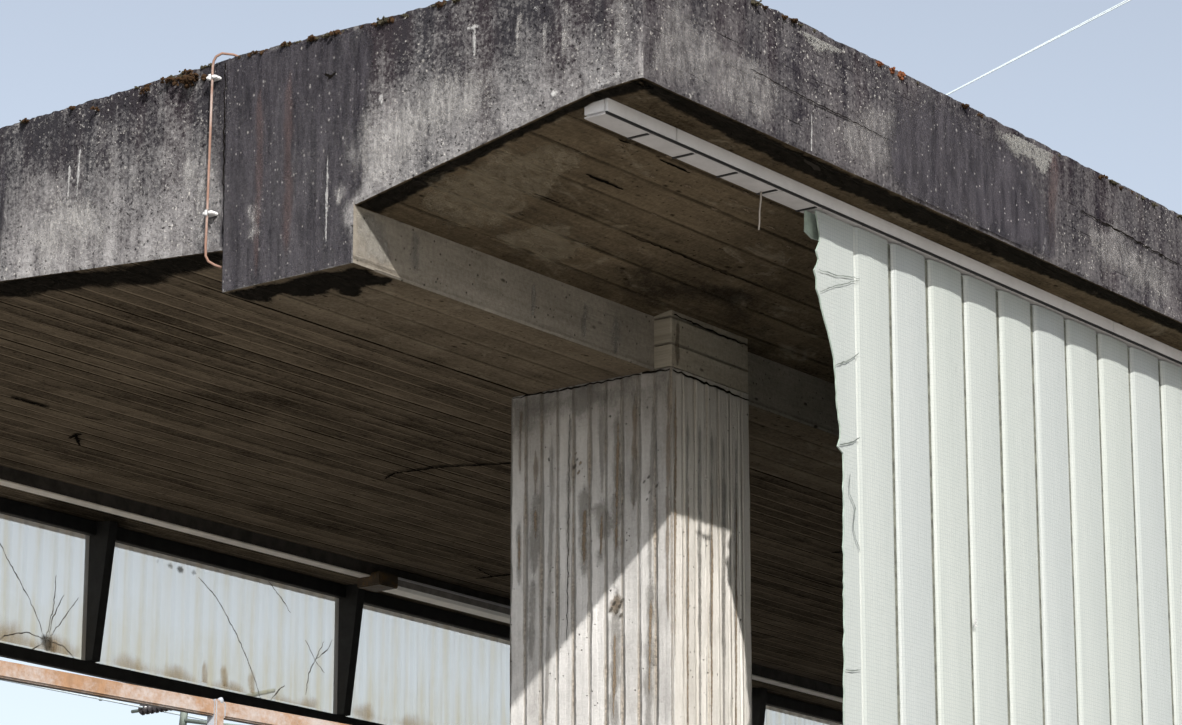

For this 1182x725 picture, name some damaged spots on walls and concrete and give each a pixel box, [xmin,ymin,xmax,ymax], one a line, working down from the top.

water stain [214,30,472,291]
water stain [890,100,1055,255]
crack [0,544,78,658]
crack [198,577,332,698]
crack [386,463,511,479]
water stain [515,402,556,715]
water stain [566,387,622,637]
water stain [610,596,619,725]
water stain [645,413,655,725]
water stain [686,429,738,725]
crack [832,480,860,553]